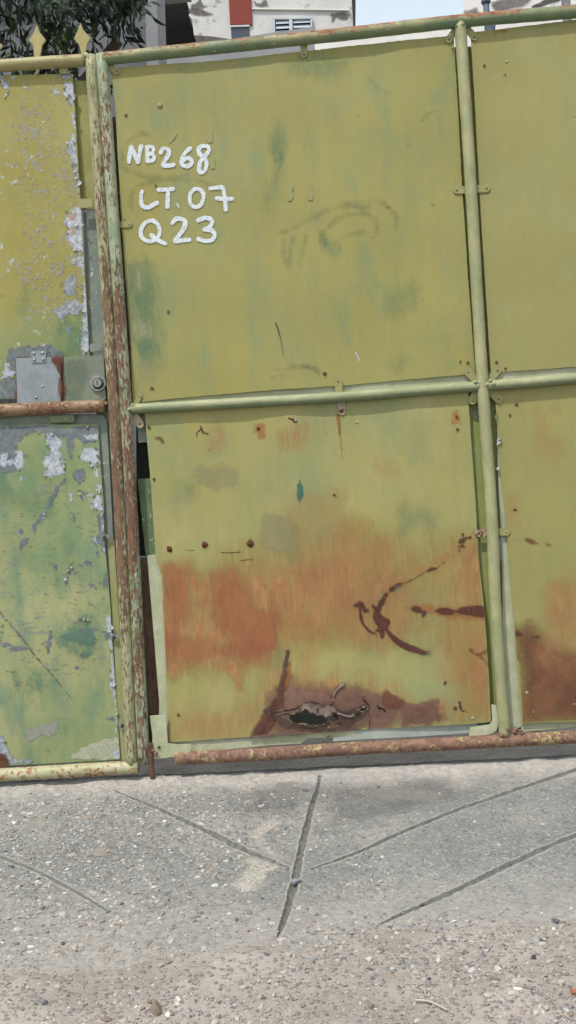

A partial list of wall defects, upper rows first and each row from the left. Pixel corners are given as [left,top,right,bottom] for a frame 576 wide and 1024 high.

peeling [0,74,89,355]
peeling [0,344,64,399]
peeling [0,424,105,585]
peeling [45,615,120,760]
corrosion [253,650,457,735]
corrosion [516,626,576,722]
peeling [0,726,33,765]